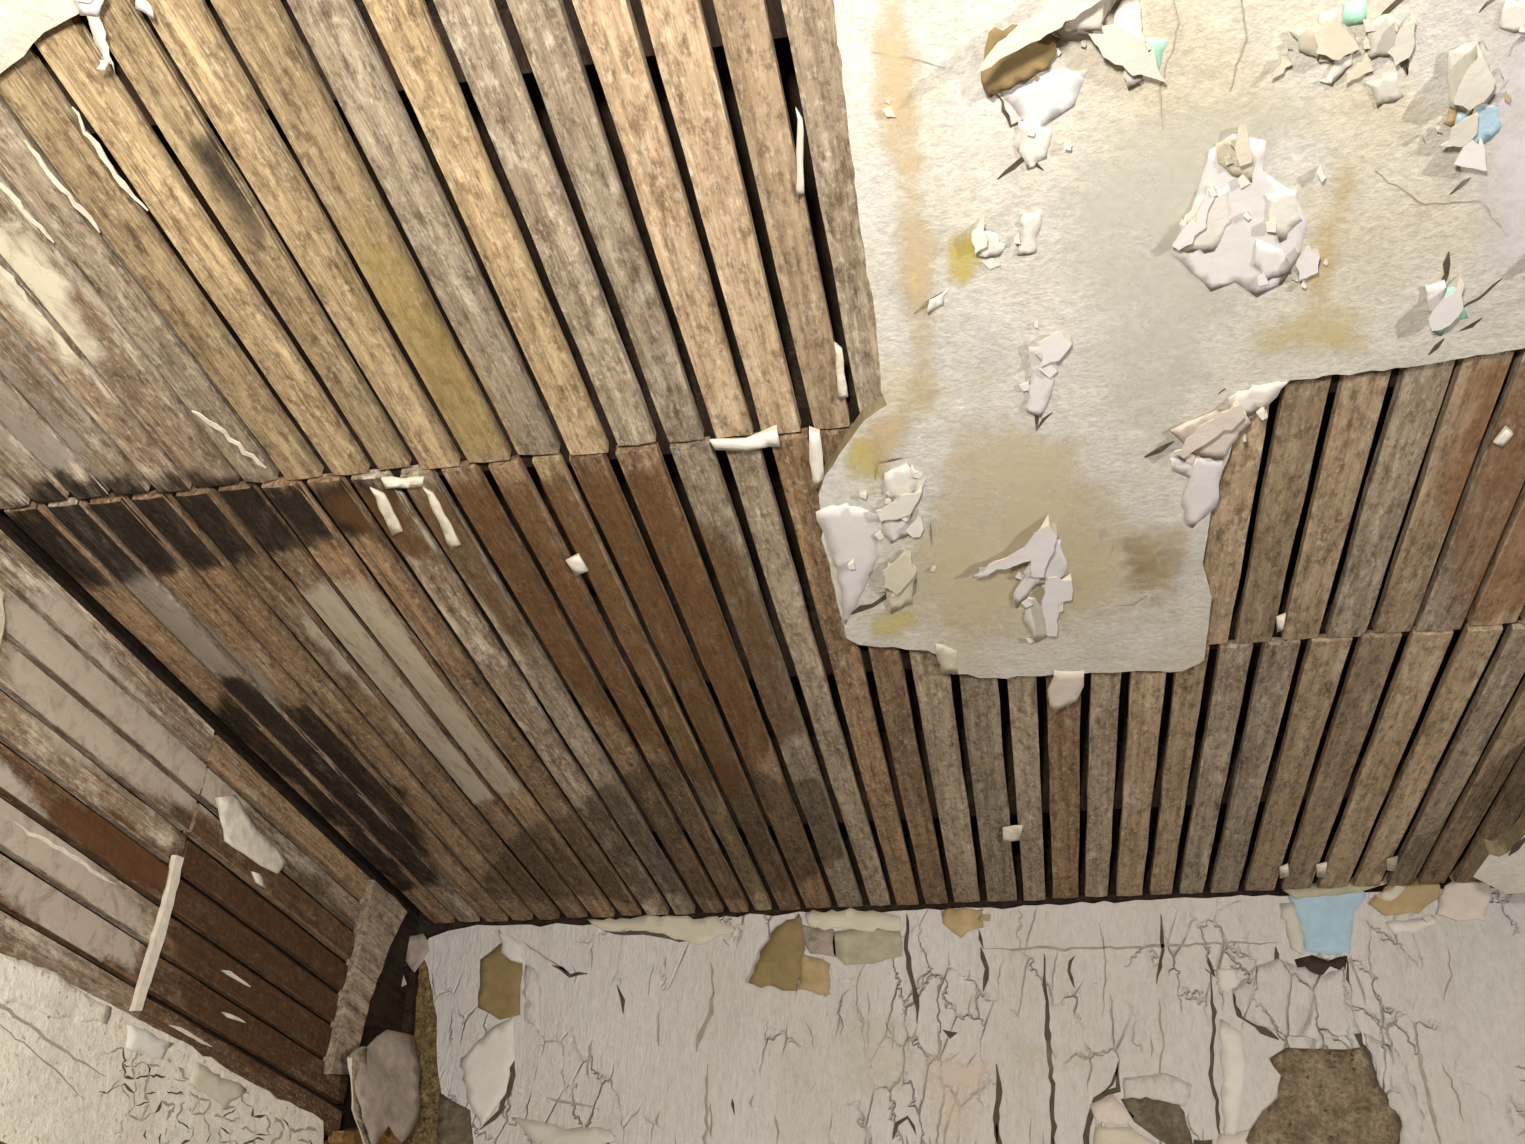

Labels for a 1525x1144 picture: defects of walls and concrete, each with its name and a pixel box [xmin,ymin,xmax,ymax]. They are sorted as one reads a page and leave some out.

peeling [976,0,1168,180]
peeling [1172,124,1328,297]
peeling [1170,382,1287,528]
damp [0,372,799,891]
damp [0,765,143,968]
crack [0,1003,317,1144]
crack [524,942,660,1046]
crack [655,963,780,1144]
spalling [748,908,903,997]
crack [867,914,1276,1144]
spalling [1090,1033,1425,1144]
crack [1344,947,1464,1144]